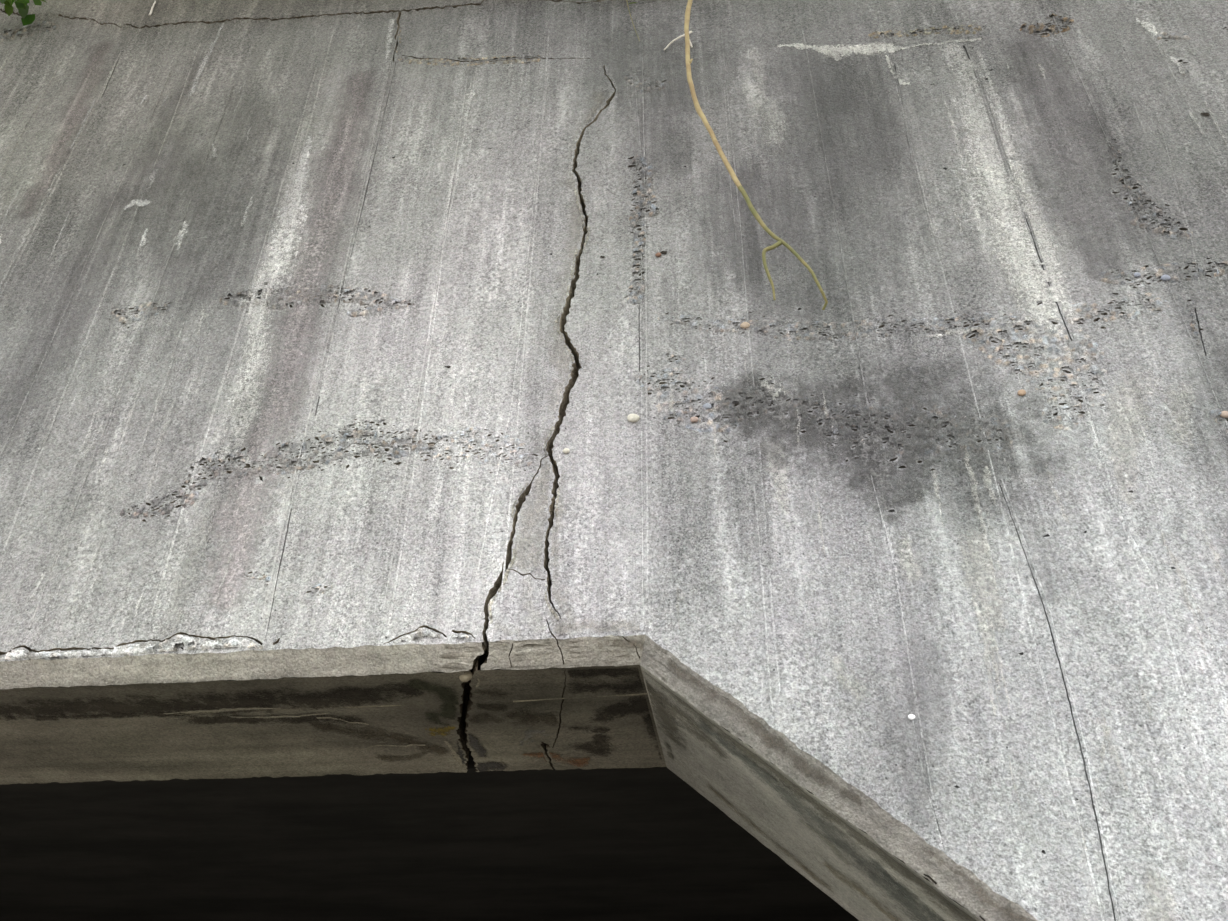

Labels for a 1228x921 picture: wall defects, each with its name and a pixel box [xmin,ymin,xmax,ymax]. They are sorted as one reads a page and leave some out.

crack [58,0,616,771]
damp [720,364,1062,519]
spalling [0,635,265,660]